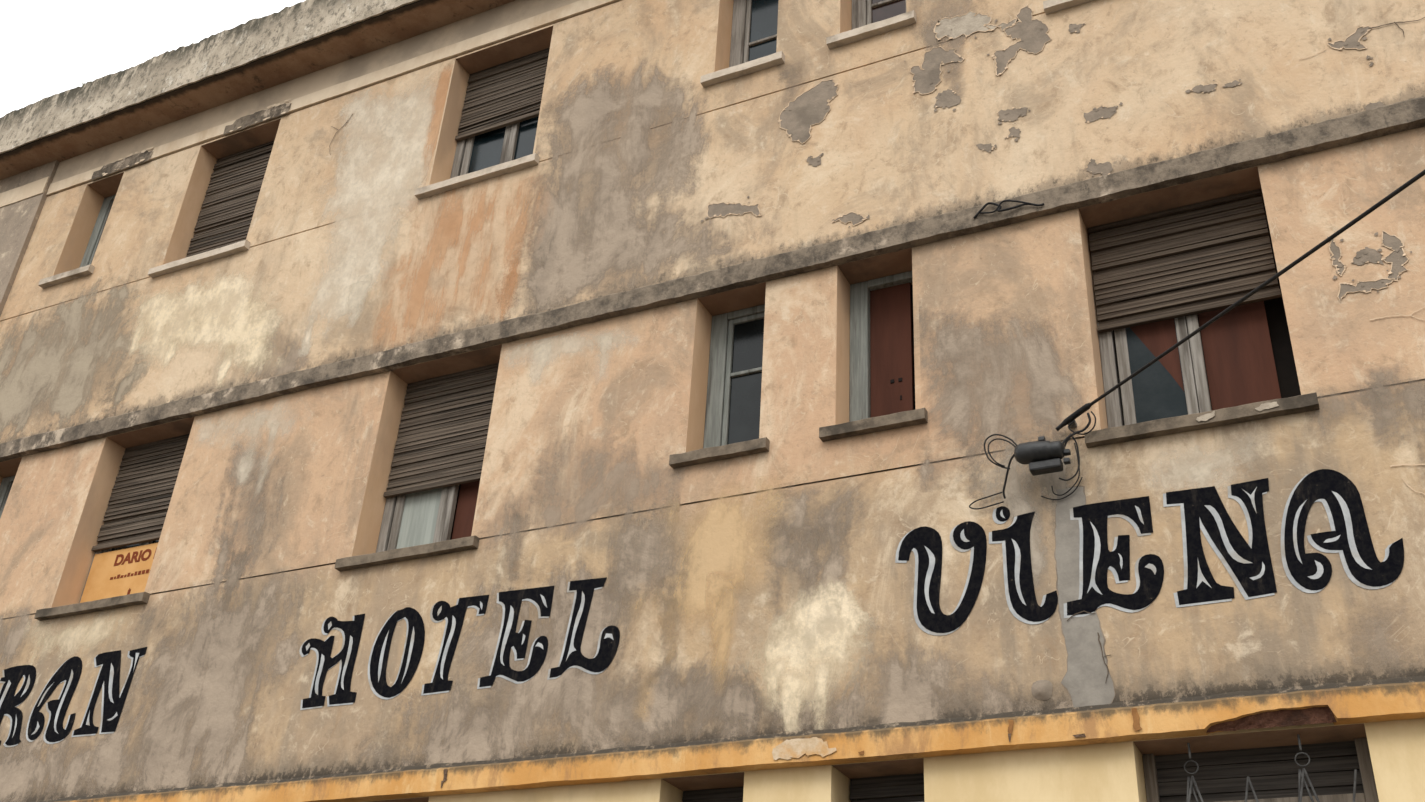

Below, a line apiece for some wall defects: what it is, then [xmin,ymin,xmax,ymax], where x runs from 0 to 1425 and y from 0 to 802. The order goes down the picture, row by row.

flaking render [904,5,1052,112]
flaking render [1327,25,1374,66]
flaking render [778,79,838,167]
flaking render [975,107,1031,153]
flaking render [1084,102,1123,123]
leakage [515,61,731,312]
flaking render [701,196,762,222]
flaking render [1327,231,1412,302]
leakage [919,313,1081,576]
leakage [360,447,1072,769]
peeling [772,737,837,760]
spalling [1206,707,1337,733]